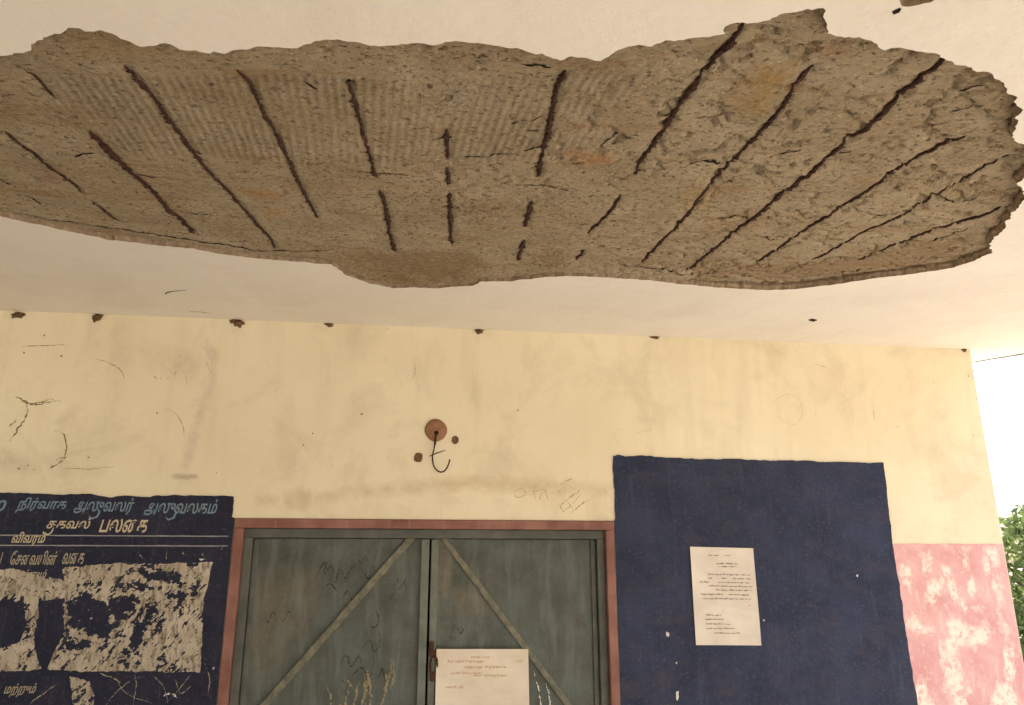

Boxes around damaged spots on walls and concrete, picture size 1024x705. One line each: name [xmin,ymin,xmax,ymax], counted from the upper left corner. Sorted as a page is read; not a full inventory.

spalling [0,8,1024,287]